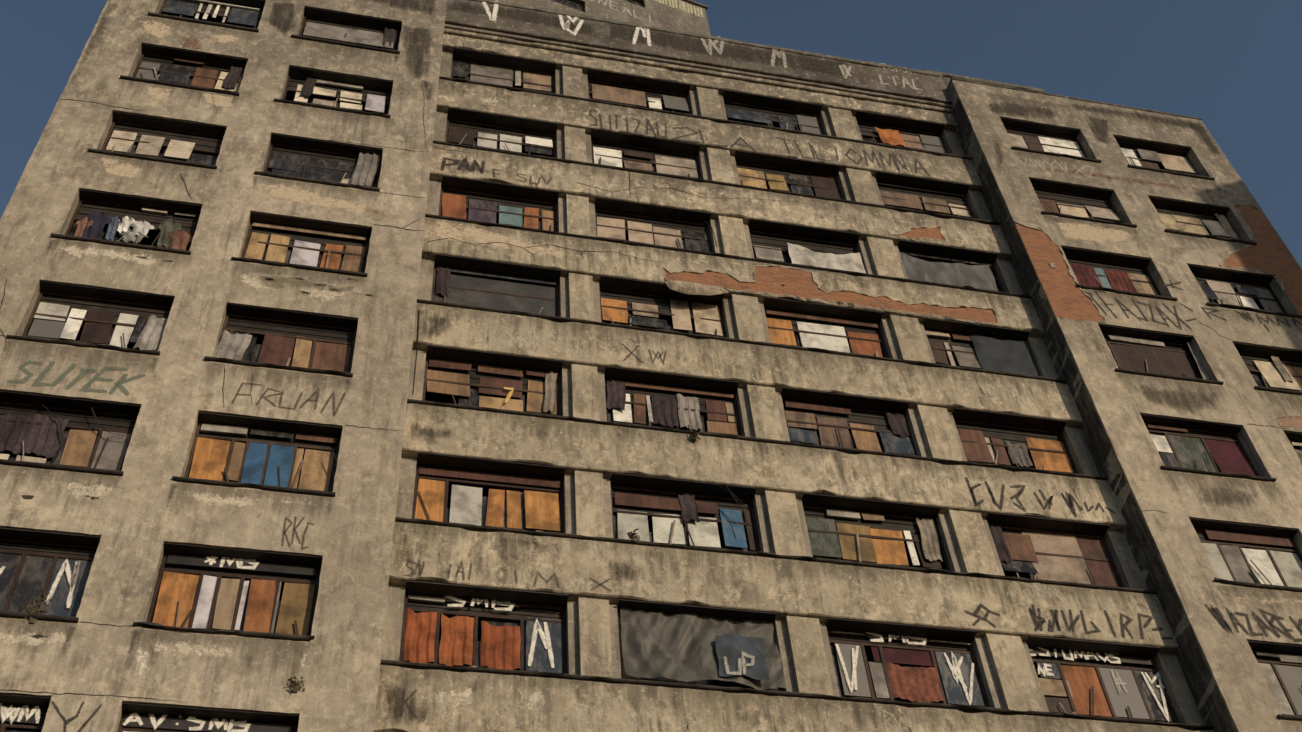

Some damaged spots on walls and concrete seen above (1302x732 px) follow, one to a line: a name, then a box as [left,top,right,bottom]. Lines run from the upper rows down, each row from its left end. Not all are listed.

spalling [661,265,999,326]
spalling [891,226,946,242]
spalling [1014,221,1130,324]
spalling [1219,204,1302,315]